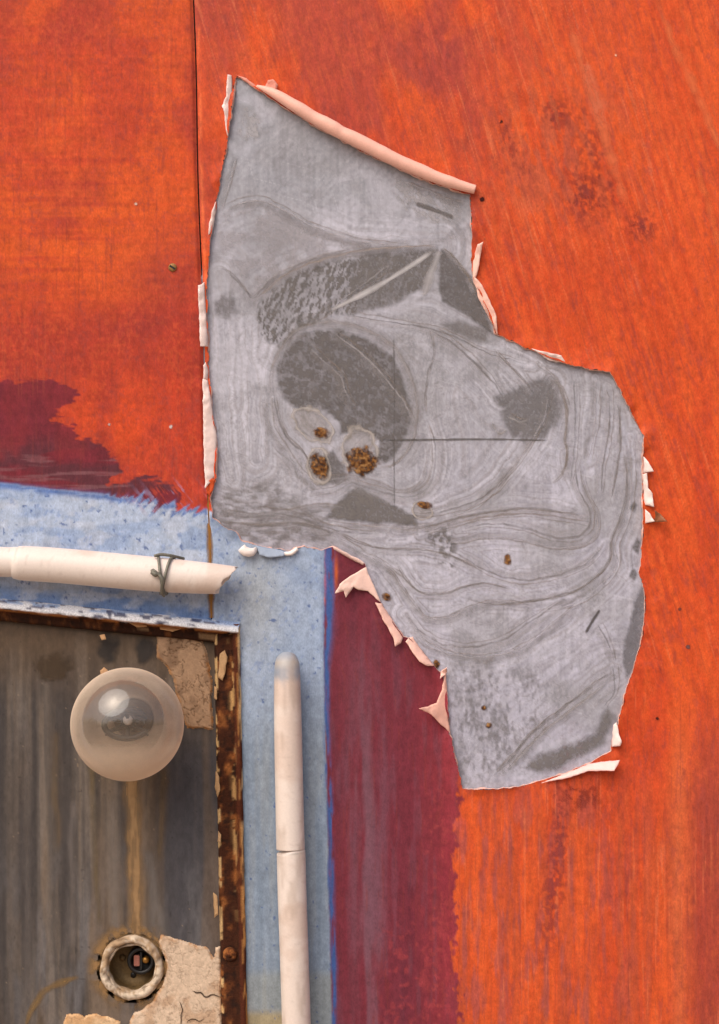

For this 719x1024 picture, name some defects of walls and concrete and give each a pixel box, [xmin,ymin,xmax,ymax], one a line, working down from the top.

rust [291,406,379,485]
peeling [198,75,667,790]
rust [412,501,433,520]
peeling [157,627,228,730]
peeling [63,934,222,1024]